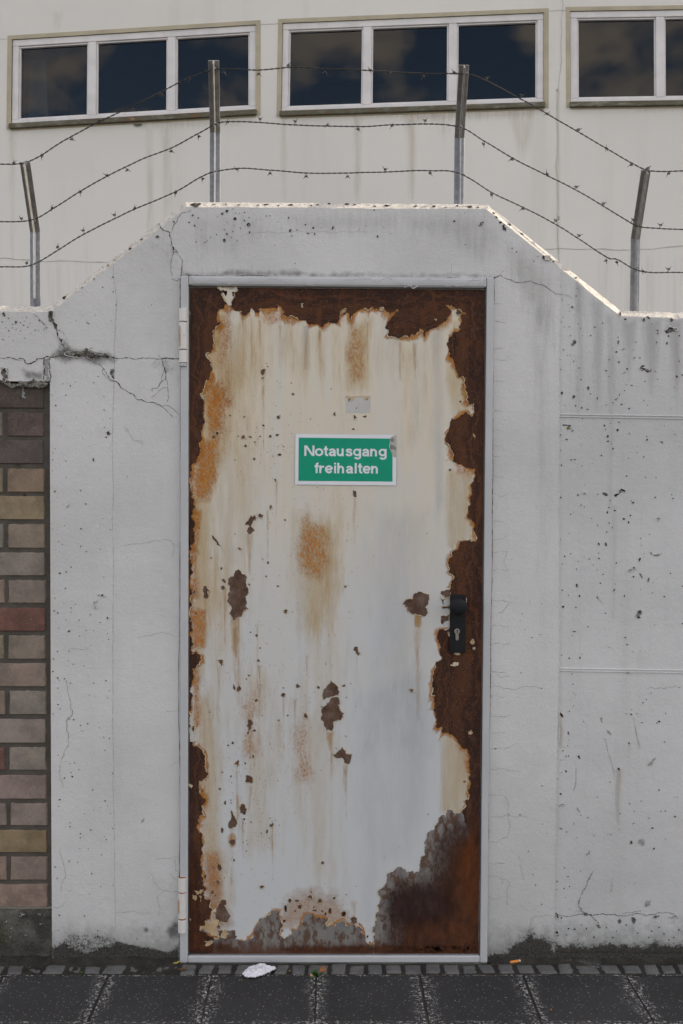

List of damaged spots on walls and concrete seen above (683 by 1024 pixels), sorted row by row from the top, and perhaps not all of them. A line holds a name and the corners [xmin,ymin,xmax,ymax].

spalling [0,358,51,388]
spalling [2,310,114,383]
crack [2,311,179,417]
peeling [192,567,250,620]
corrosion [178,287,485,954]
peeling [189,809,479,954]
crack [530,873,673,924]
damp [0,937,180,959]
damp [487,934,683,961]